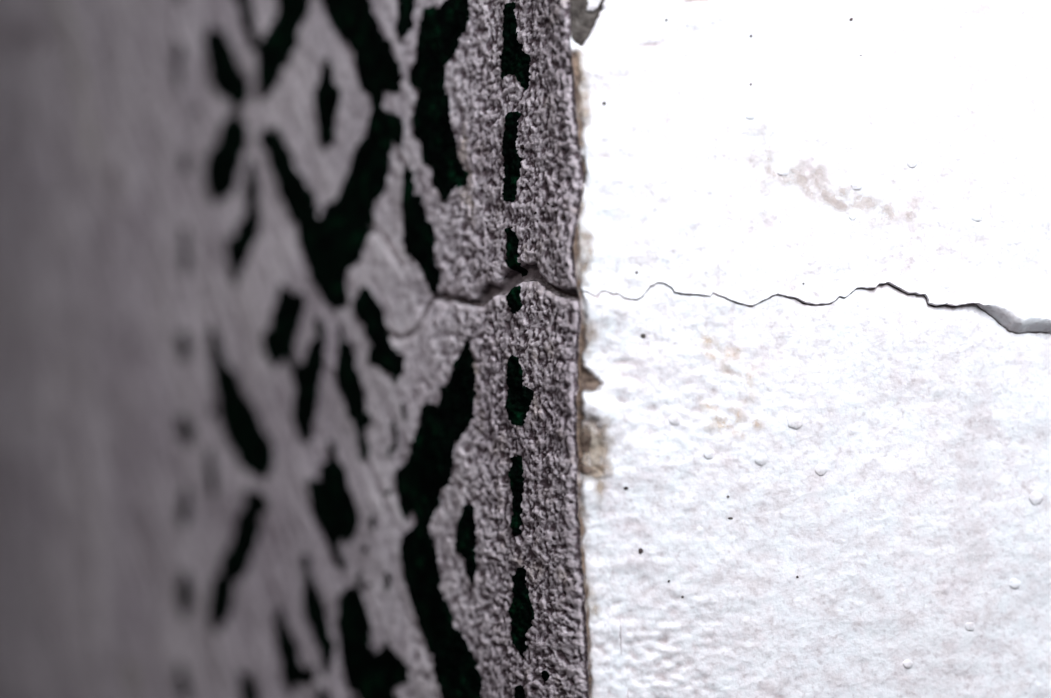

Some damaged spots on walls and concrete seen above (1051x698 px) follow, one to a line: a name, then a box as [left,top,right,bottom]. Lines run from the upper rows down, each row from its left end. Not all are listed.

spalling [569,0,605,46]
crack [387,264,1051,339]
spalling [577,357,603,391]
spalling [577,426,603,474]